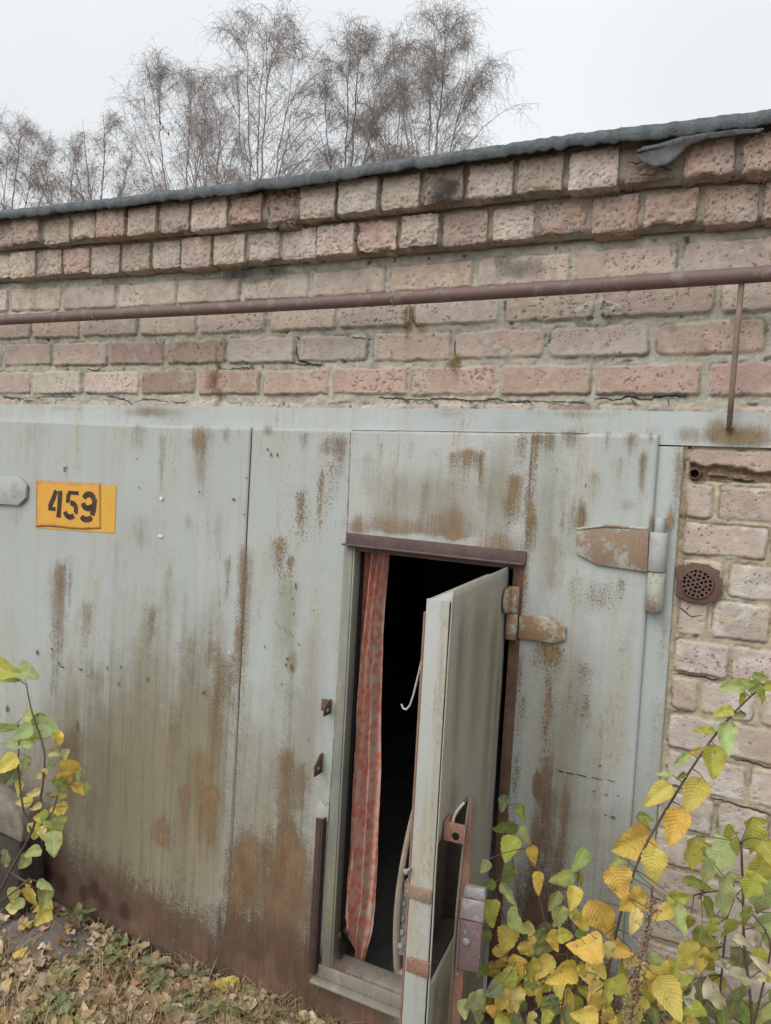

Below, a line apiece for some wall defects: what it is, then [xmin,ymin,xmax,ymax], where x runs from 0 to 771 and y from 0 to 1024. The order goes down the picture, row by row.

crack [377,395,687,408]
corrosion [296,439,345,537]
corrosion [352,504,465,540]
corrosion [447,448,485,489]
corrosion [485,431,576,611]
corrosion [576,505,585,528]
corrosion [649,448,687,566]
corrosion [269,535,294,594]
corrosion [43,550,398,1024]
corrosion [506,643,595,983]
corrosion [521,979,555,1024]
corrosion [575,975,622,1024]